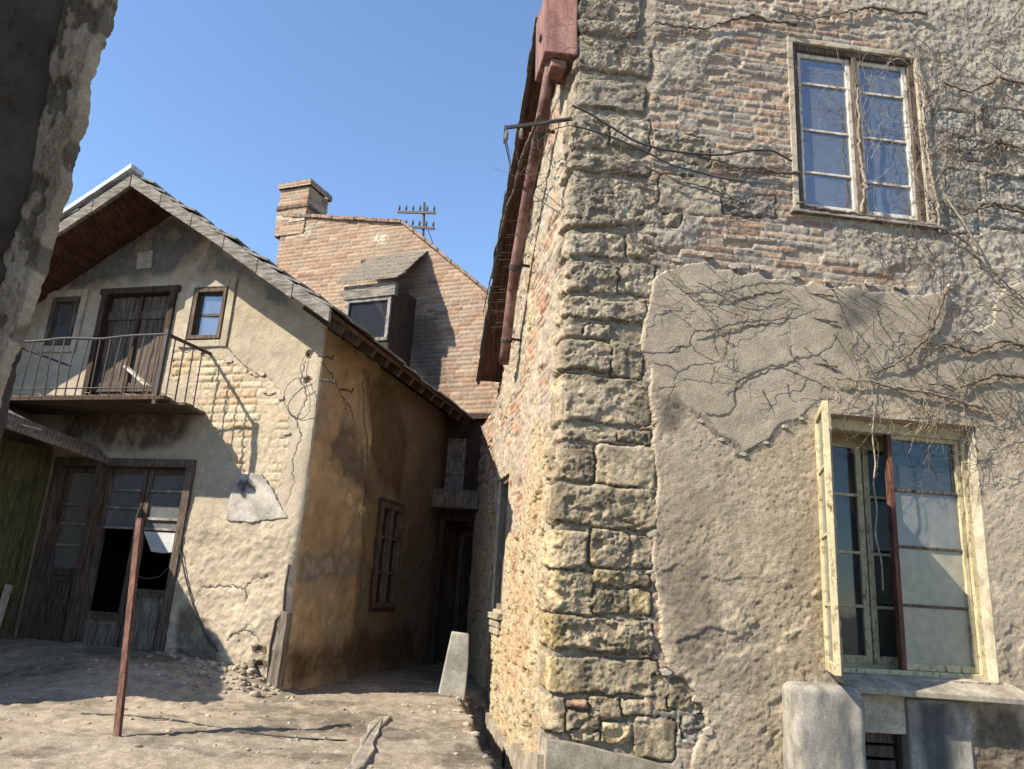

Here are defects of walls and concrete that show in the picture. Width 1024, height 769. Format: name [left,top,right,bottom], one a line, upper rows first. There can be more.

spalling [670,131,1001,333]
spalling [169,348,291,495]
crack [285,361,369,626]
water stain [331,378,406,495]
crack [201,573,275,642]
spalling [631,668,713,769]